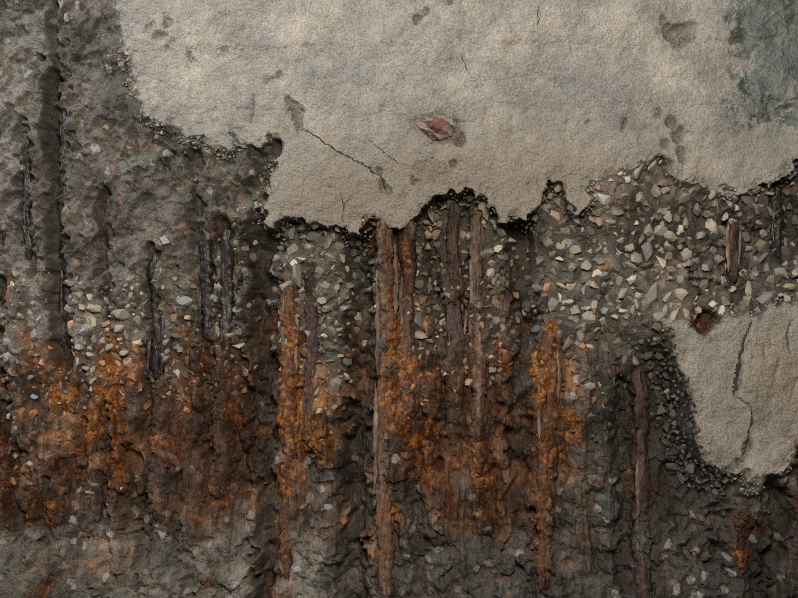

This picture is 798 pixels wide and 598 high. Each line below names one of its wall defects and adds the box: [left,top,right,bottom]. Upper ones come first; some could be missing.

hole [285,95,306,134]
spalling [655,108,689,166]
spalling [659,13,699,51]
peeling [705,0,798,136]
corrosion [360,215,382,252]
spalling [724,221,742,283]
spalling [769,185,784,258]
corrosion [0,320,138,539]
corrosion [148,335,256,521]
corrosion [275,304,340,501]
corrosion [376,247,518,532]
corrosion [526,319,585,546]